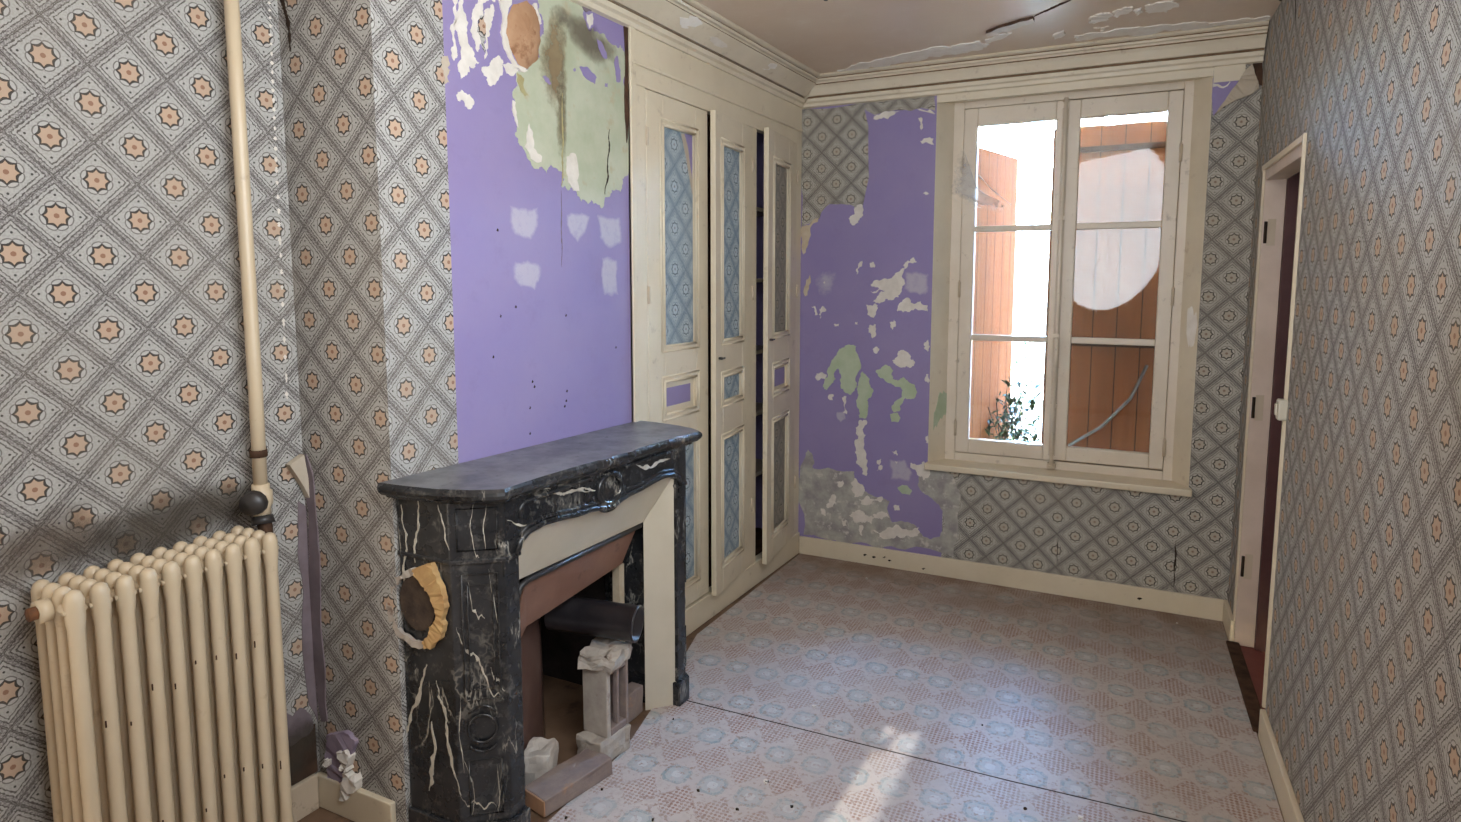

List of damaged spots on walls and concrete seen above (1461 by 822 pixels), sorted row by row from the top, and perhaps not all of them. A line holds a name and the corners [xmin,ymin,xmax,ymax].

crack [280,0,291,52]
crack [1033,0,1071,18]
peeling [512,0,629,208]
leakage [544,19,606,186]
peeling [918,109,935,145]
peeling [803,276,928,354]
peeling [821,451,930,536]